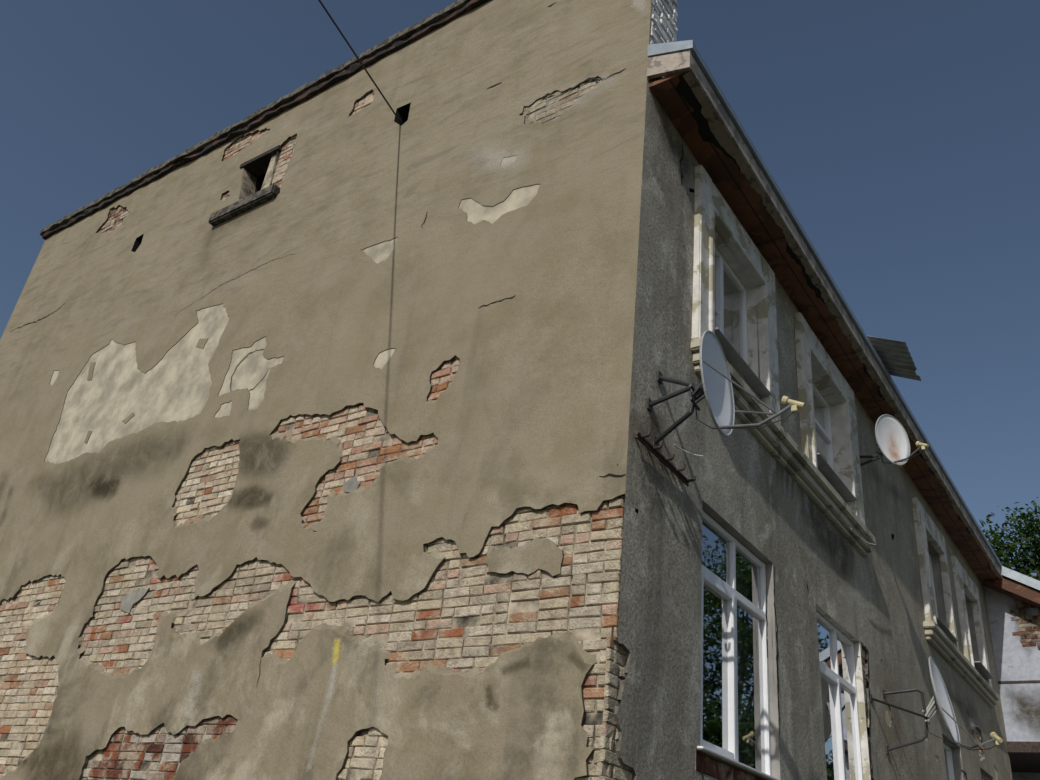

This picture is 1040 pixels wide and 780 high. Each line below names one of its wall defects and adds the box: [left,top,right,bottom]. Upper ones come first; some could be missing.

flaking render [221,128,270,162]
flaking render [261,134,297,190]
flaking render [519,76,603,125]
flaking render [427,355,460,404]
flaking render [172,439,240,528]
flaking render [269,403,438,533]
flaking render [0,574,66,780]
flaking render [78,494,639,780]
flaking render [857,644,873,780]